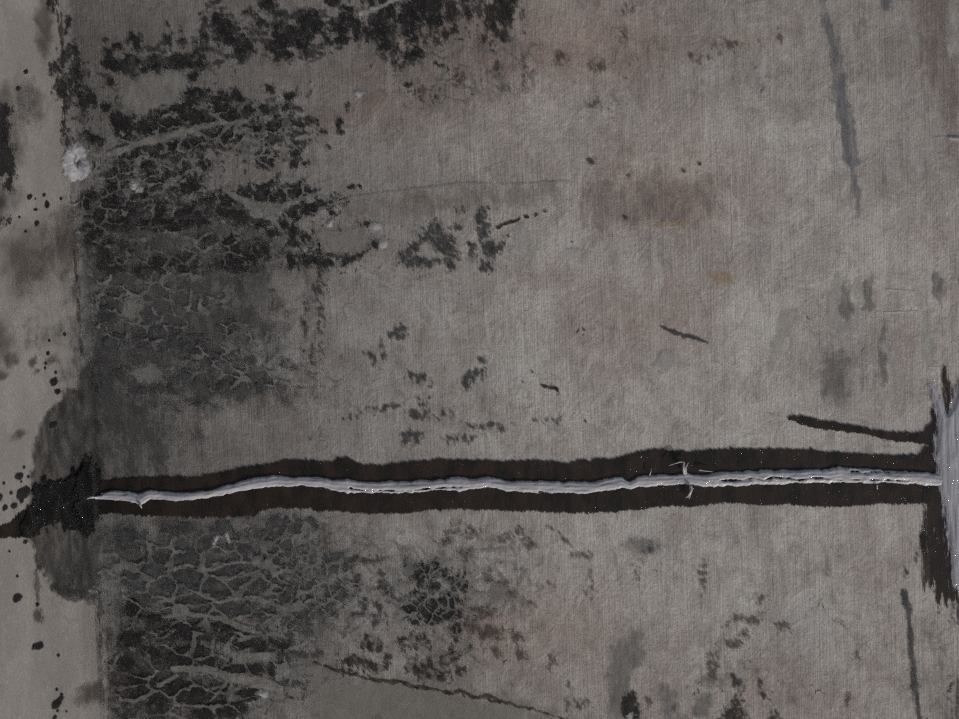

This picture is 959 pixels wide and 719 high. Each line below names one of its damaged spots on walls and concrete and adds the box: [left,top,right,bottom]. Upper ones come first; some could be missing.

damp [0,89,35,226]
damp [822,20,860,210]
crack [0,510,41,540]
crack [87,365,959,618]
crack [313,662,563,719]